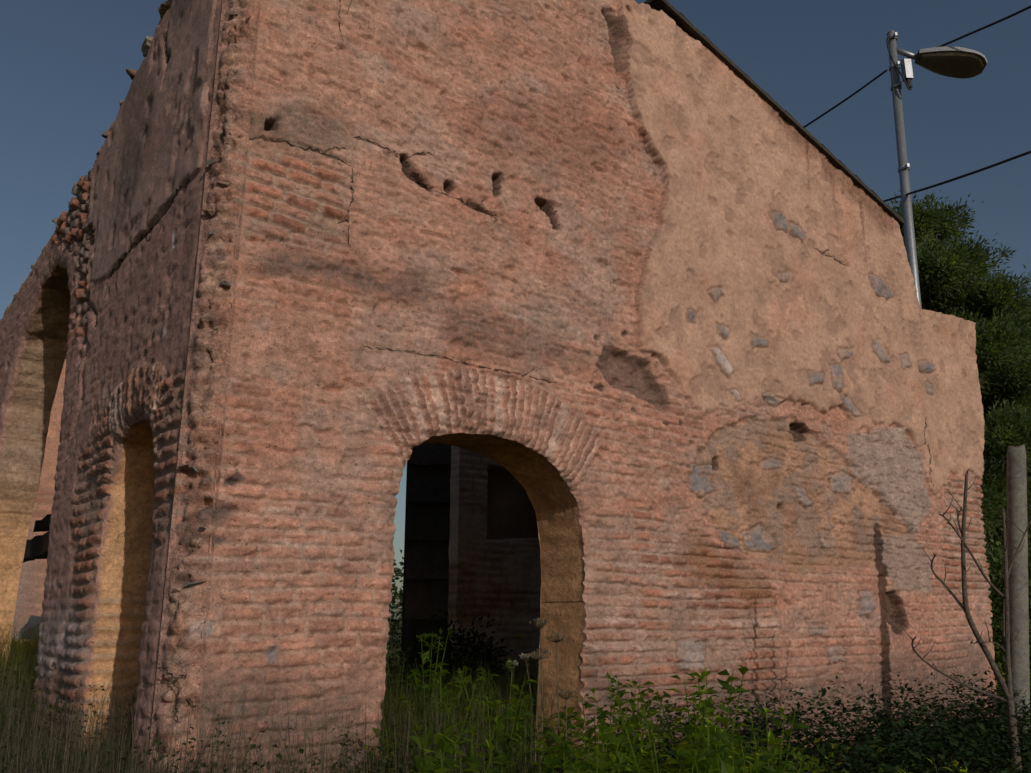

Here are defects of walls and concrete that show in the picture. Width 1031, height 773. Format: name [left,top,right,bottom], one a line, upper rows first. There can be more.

crack [229,133,501,247]
spalling [399,153,457,195]
spalling [491,173,504,197]
spalling [465,199,497,219]
spalling [534,196,561,230]
crack [110,179,190,286]
crack [364,346,556,383]